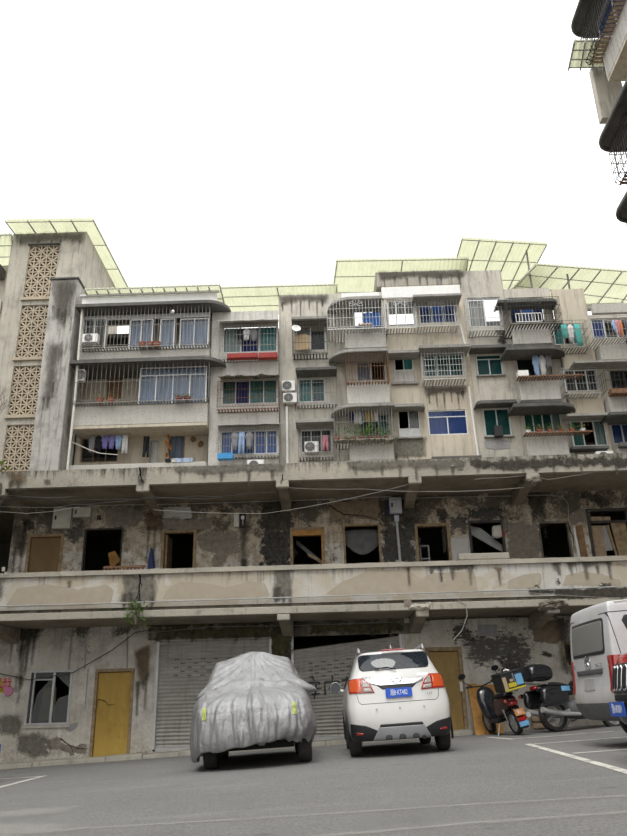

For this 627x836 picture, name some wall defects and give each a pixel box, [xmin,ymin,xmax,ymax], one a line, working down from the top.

water stain [54,281,75,324]
water stain [43,344,61,407]
water stain [430,565,474,580]
water stain [529,587,627,600]
water stain [567,561,611,577]
water stain [11,628,40,685]
water stain [135,647,150,715]
water stain [0,716,51,757]